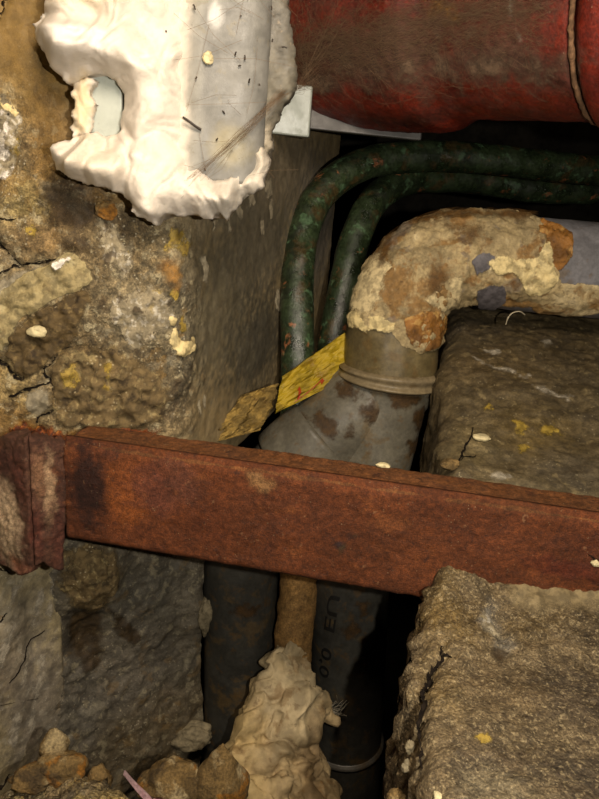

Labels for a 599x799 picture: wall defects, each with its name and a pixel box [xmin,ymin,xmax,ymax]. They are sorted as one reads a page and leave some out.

crack [0,242,72,274]
spalling [96,217,133,281]
spalling [0,252,170,430]
spalling [109,285,196,358]
crack [416,646,452,769]